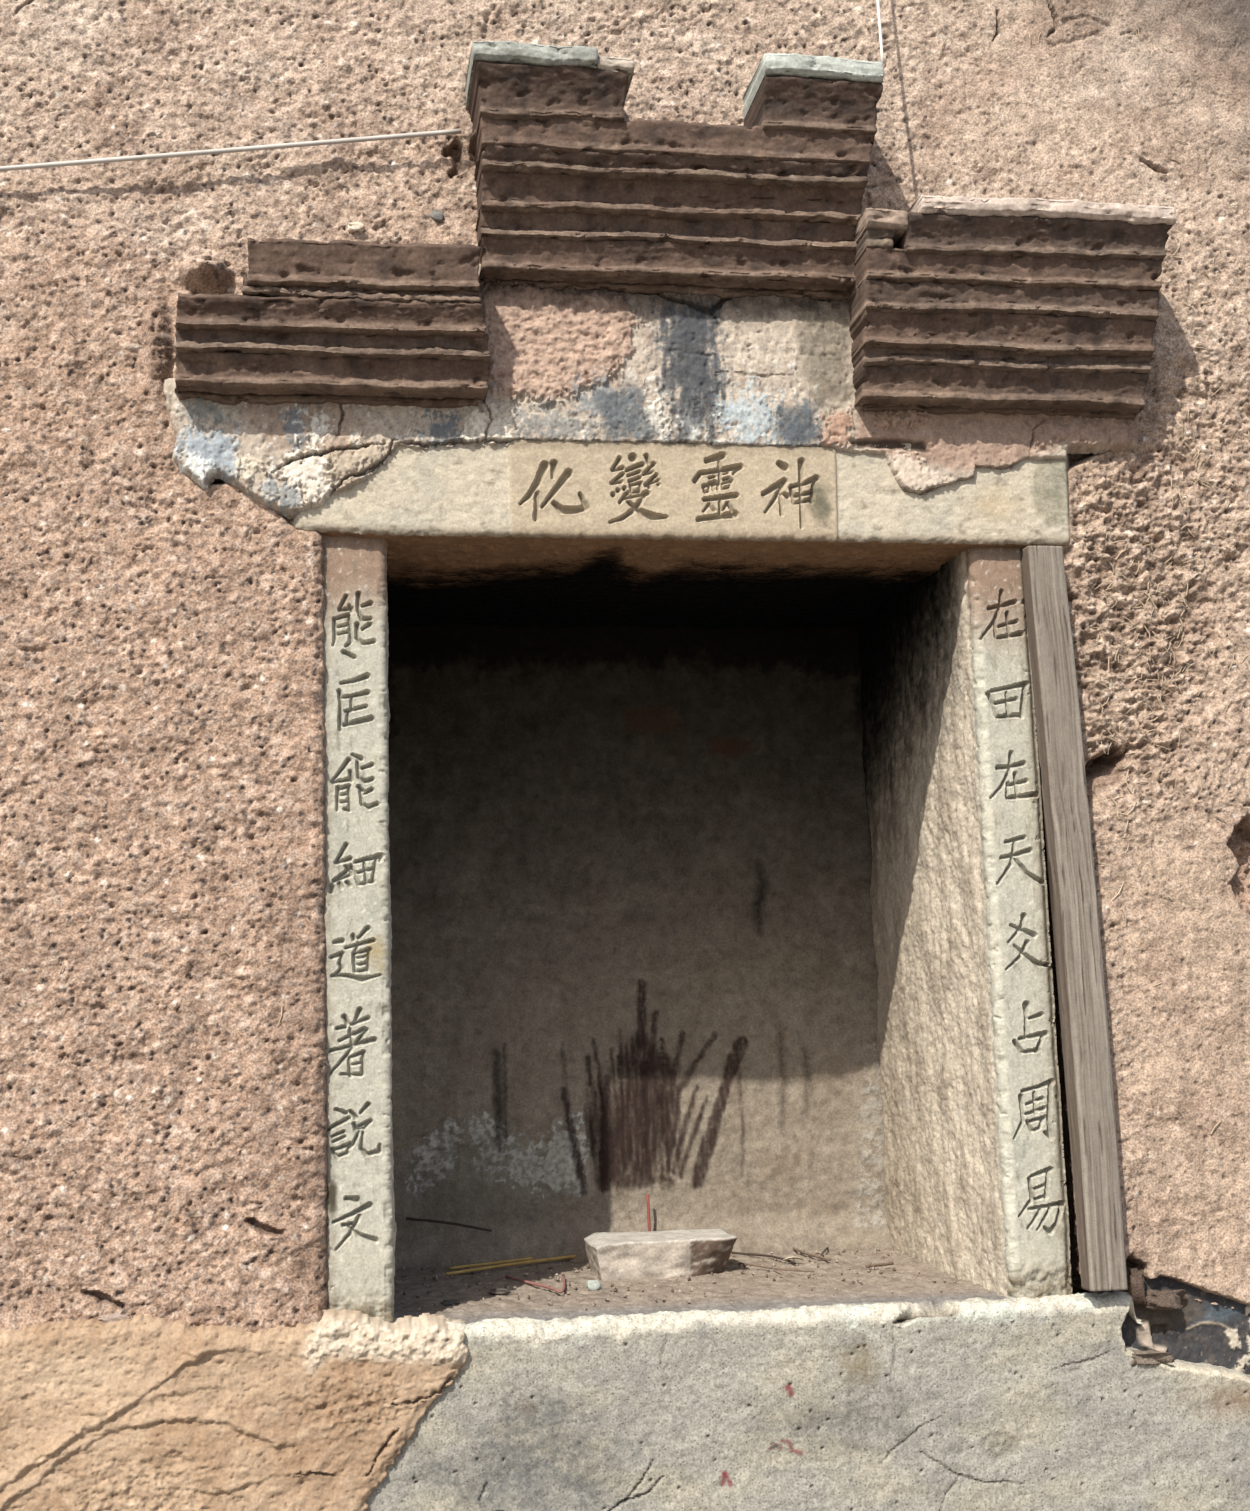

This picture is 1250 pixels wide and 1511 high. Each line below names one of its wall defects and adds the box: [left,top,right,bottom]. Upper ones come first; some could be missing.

crack [991,9,1002,42]
crack [1047,0,1059,38]
peeling [415,280,953,496]
leakage [541,287,846,445]
flaking render [167,397,399,518]
spalling [1226,813,1250,916]
leakage [405,1111,591,1198]
peeling [1100,1255,1250,1375]
crack [297,1376,454,1478]
crack [477,1482,502,1511]
crack [607,1459,665,1511]